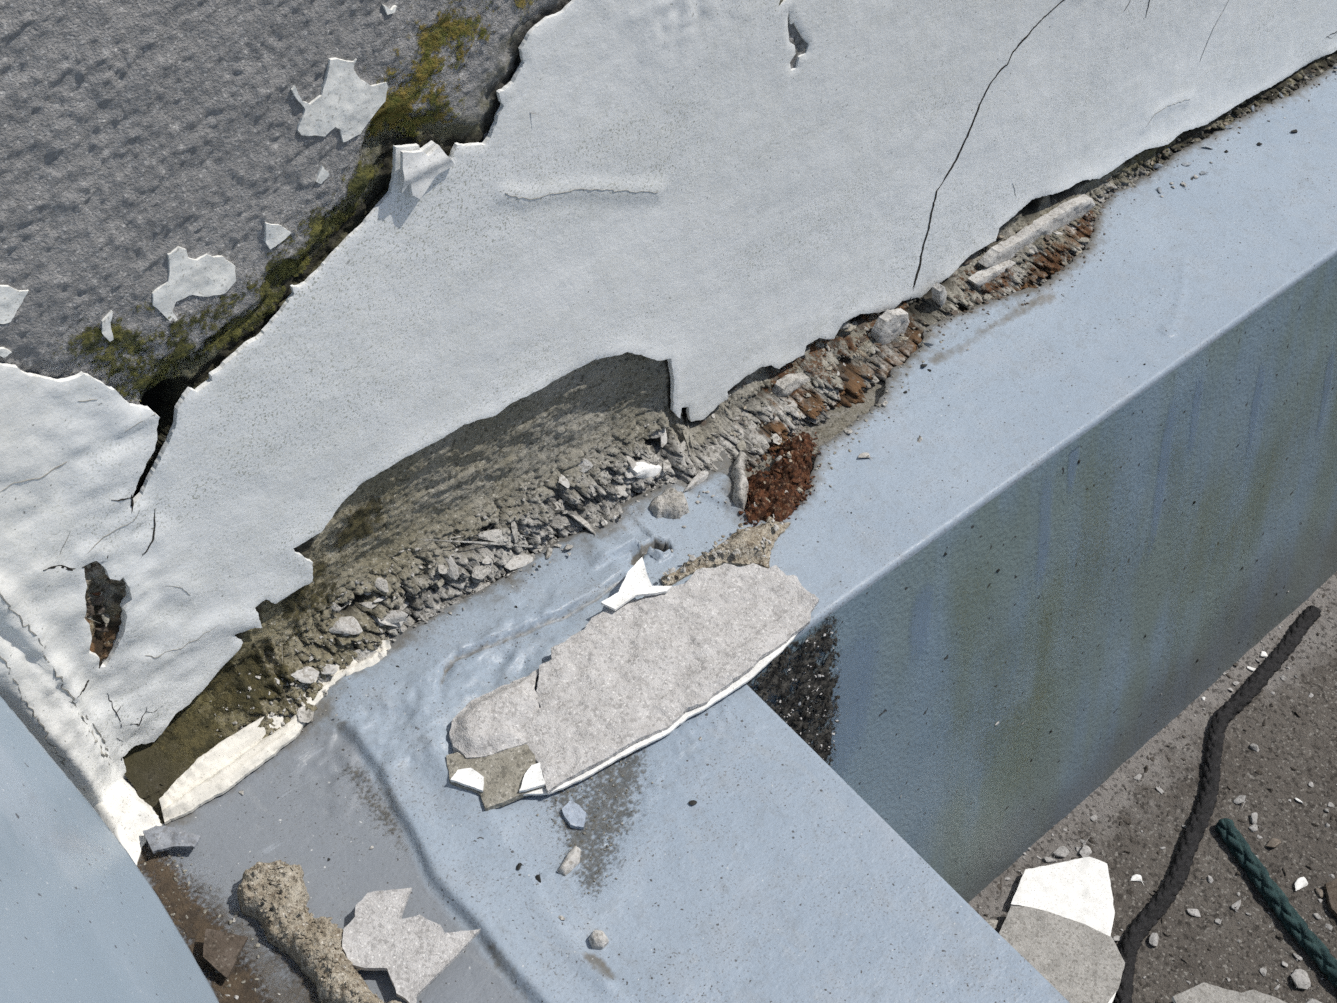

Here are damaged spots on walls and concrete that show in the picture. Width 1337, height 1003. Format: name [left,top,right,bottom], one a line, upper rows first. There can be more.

spalling [0,0,571,493]
spalling [775,0,808,69]
crack [909,0,1064,301]
spalling [84,561,127,662]
spalling [123,151,1166,825]
corrosion [738,425,821,527]